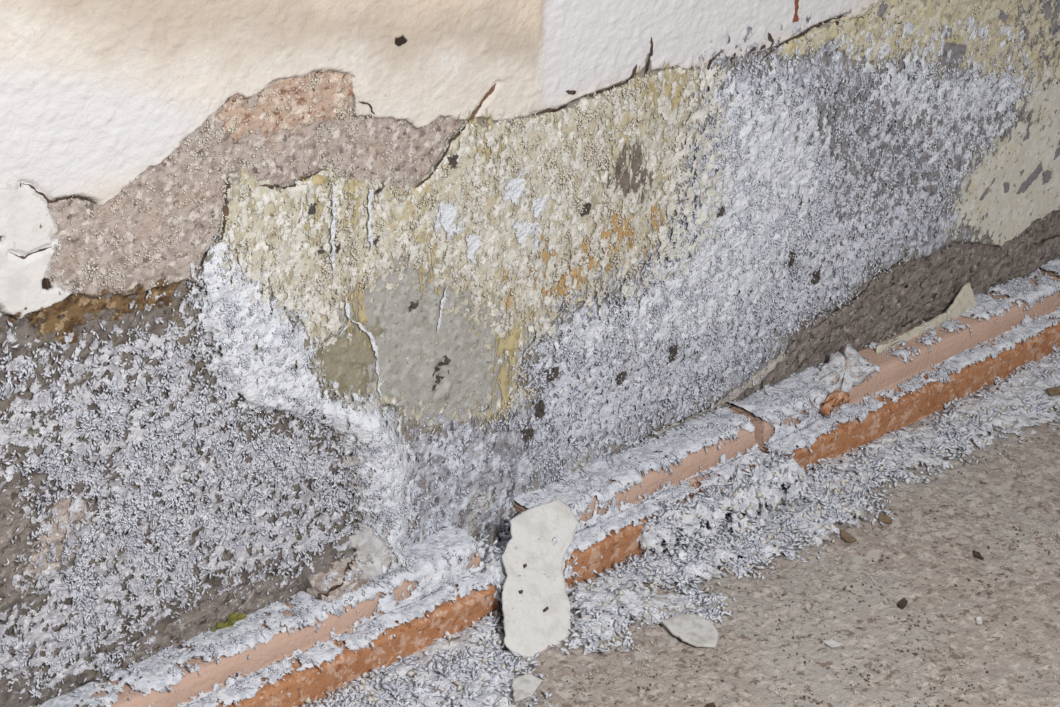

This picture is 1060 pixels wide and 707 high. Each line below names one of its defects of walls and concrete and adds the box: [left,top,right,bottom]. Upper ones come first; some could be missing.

peeling [774,0,1060,90]
damp [634,60,692,113]
damp [458,109,506,176]
damp [607,142,660,207]
peeling [980,147,1060,200]
damp [297,171,370,247]
damp [413,231,445,299]
flaking render [713,211,1060,410]
damp [959,258,1060,323]
flaking render [0,57,739,707]
damp [727,306,1060,454]
damp [312,571,338,591]